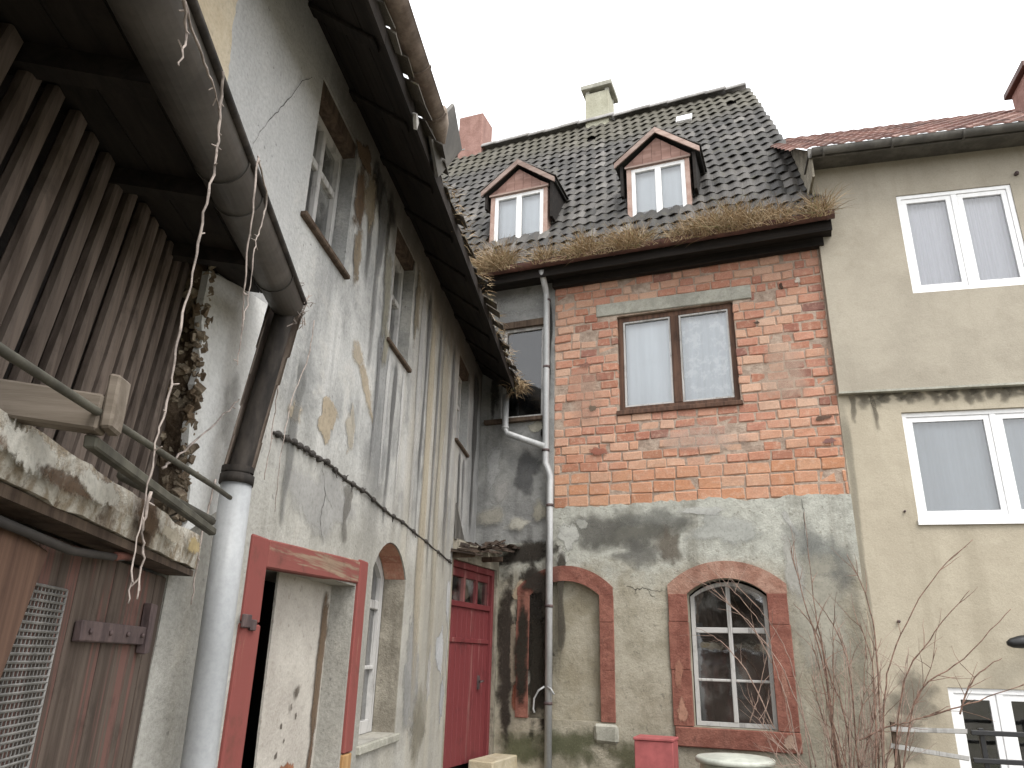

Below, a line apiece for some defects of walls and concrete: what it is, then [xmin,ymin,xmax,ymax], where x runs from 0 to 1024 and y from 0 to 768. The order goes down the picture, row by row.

peeling [353,140,376,282]
spalling [0,421,120,507]
peeling [318,396,355,452]
peeling [354,342,373,419]
water stain [366,164,542,755]
water stain [499,295,553,391]
water stain [850,386,1024,422]
spalling [136,504,200,554]
water stain [581,510,686,565]
water stain [495,540,566,739]